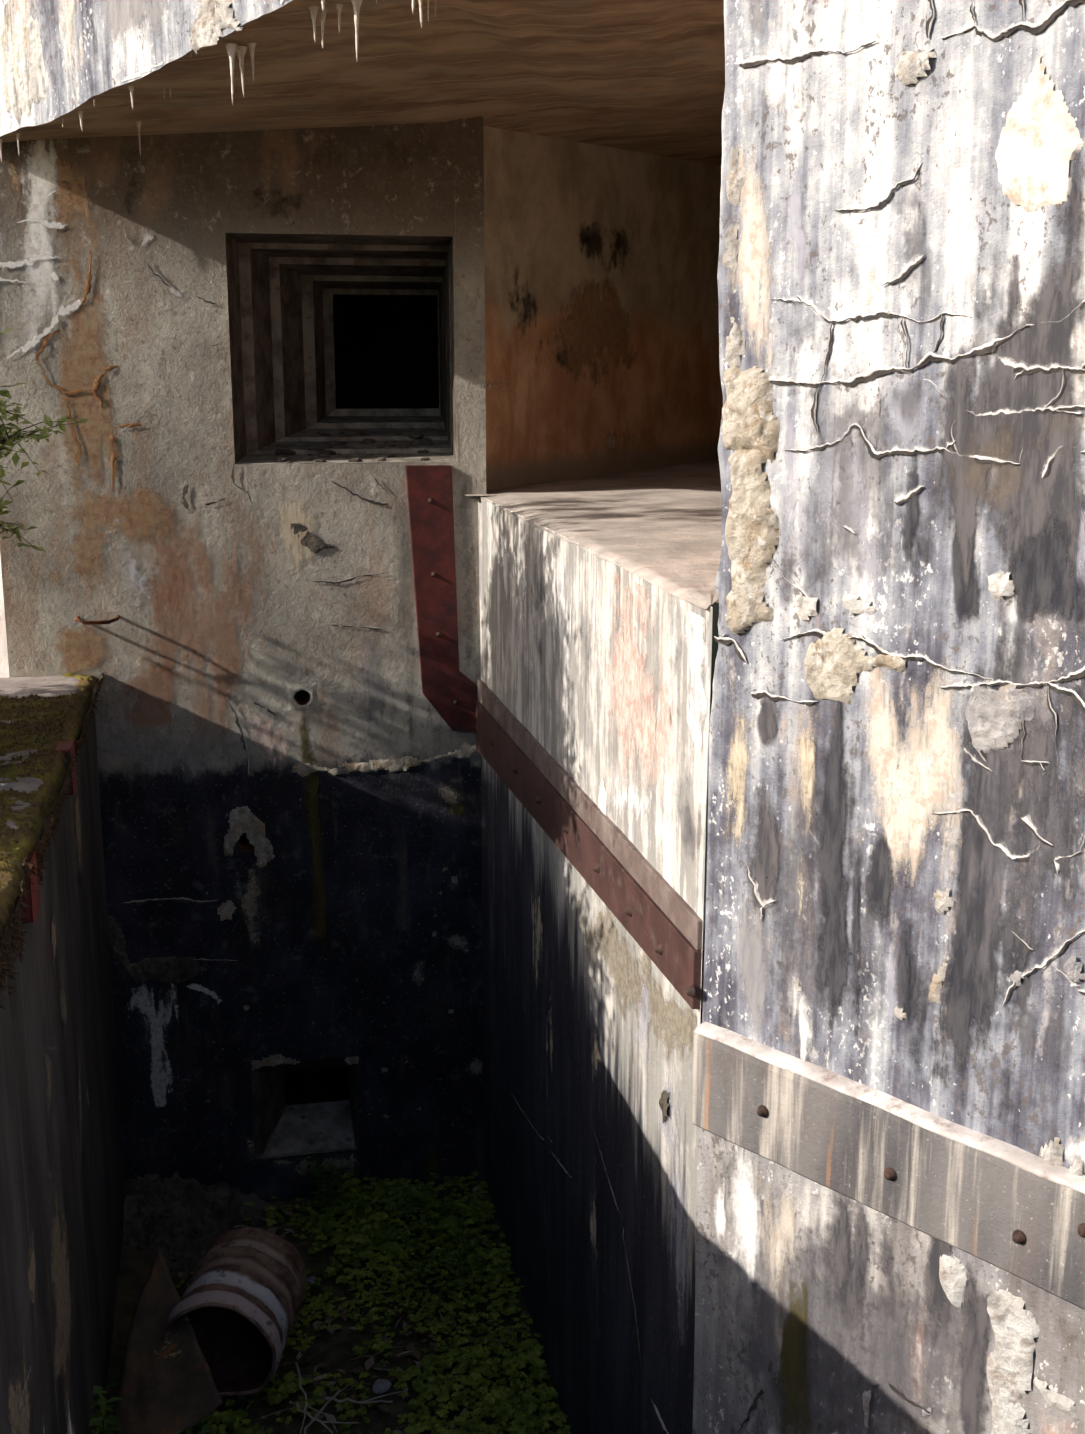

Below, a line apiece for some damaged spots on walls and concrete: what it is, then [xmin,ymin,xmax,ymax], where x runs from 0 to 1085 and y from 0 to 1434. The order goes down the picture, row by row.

crack [925,0,1085,42]
rust [53,156,97,247]
peeling [995,56,1084,213]
rust [60,289,172,590]
crack [769,254,1085,505]
rust [56,625,105,673]
crack [772,561,1085,789]
leakage [738,667,1085,1079]
crack [931,809,1085,874]
leakage [1065,1141,1085,1164]
peeling [939,1254,967,1309]
peeling [984,1289,1080,1434]